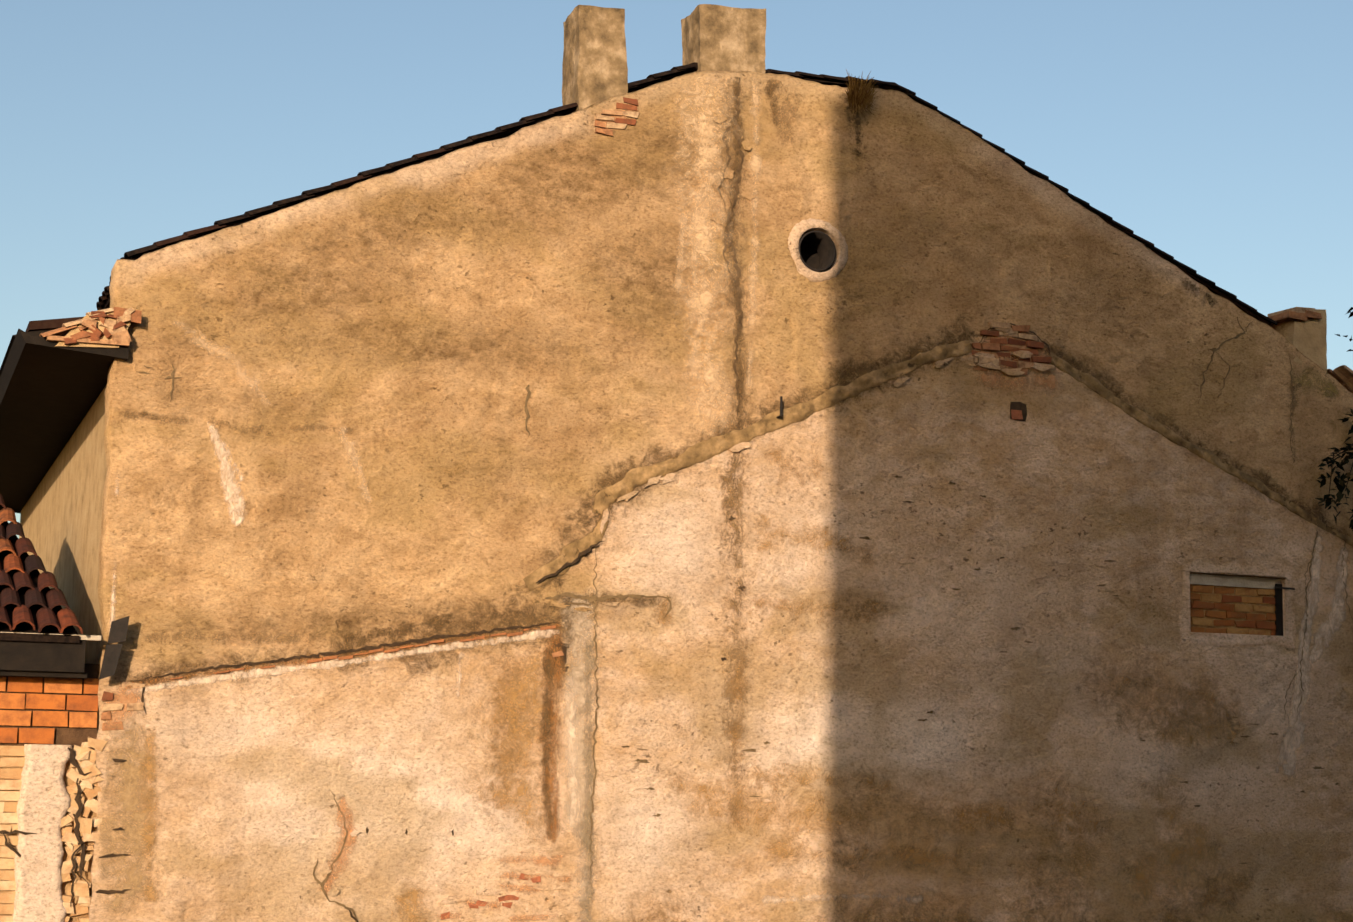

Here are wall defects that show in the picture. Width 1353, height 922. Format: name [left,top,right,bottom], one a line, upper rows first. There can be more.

peeling [594,97,640,136]
peeling [972,322,1057,421]
crack [1198,317,1252,403]
crack [130,541,672,902]
water stain [478,636,595,918]
crack [313,791,361,922]
spalling [439,856,569,922]